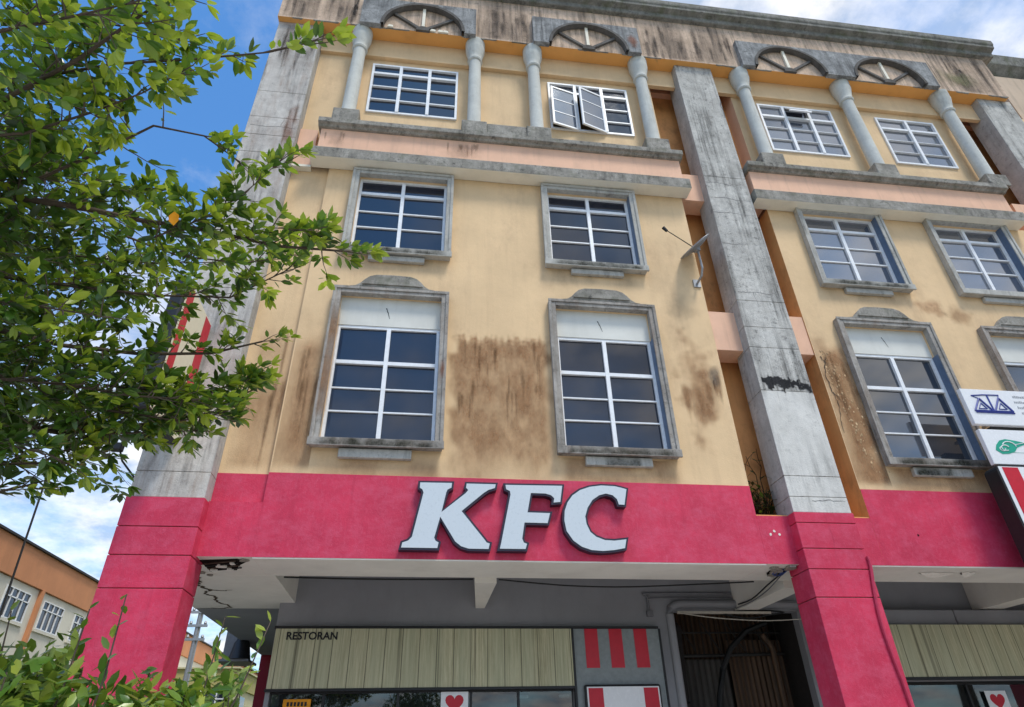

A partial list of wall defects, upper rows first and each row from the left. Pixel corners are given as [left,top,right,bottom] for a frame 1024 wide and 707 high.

leakage [452,338,549,455]
leakage [686,371,721,420]
peeling [761,376,813,393]
crack [820,352,845,433]
crack [197,577,232,609]